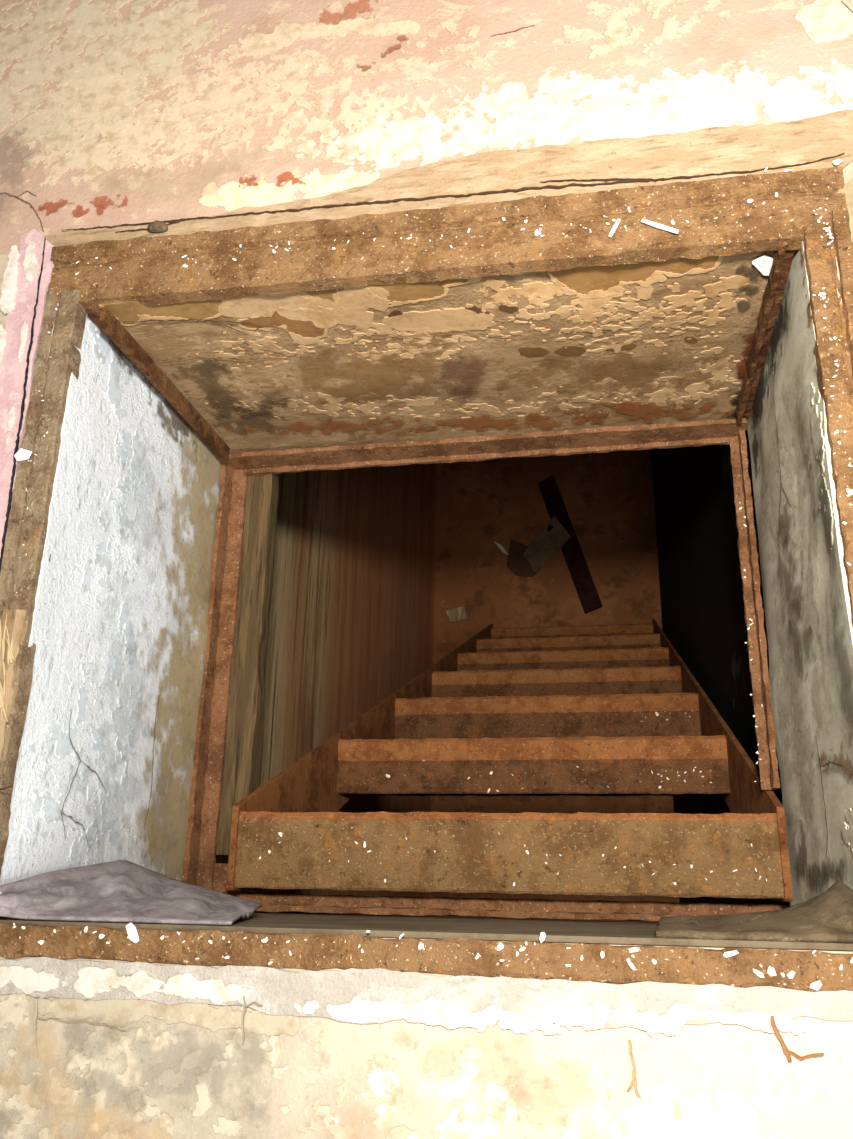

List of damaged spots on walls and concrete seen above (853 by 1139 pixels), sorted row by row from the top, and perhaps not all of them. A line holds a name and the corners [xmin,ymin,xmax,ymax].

peeling [0,0,853,212]
peeling [752,255,773,276]
peeling [0,242,38,371]
peeling [6,406,32,461]
damp [175,358,289,434]
damp [299,335,484,402]
spalling [71,256,749,603]
damp [497,352,726,399]
damp [726,280,844,891]
spalling [0,966,806,1139]
spalling [701,1045,832,1112]